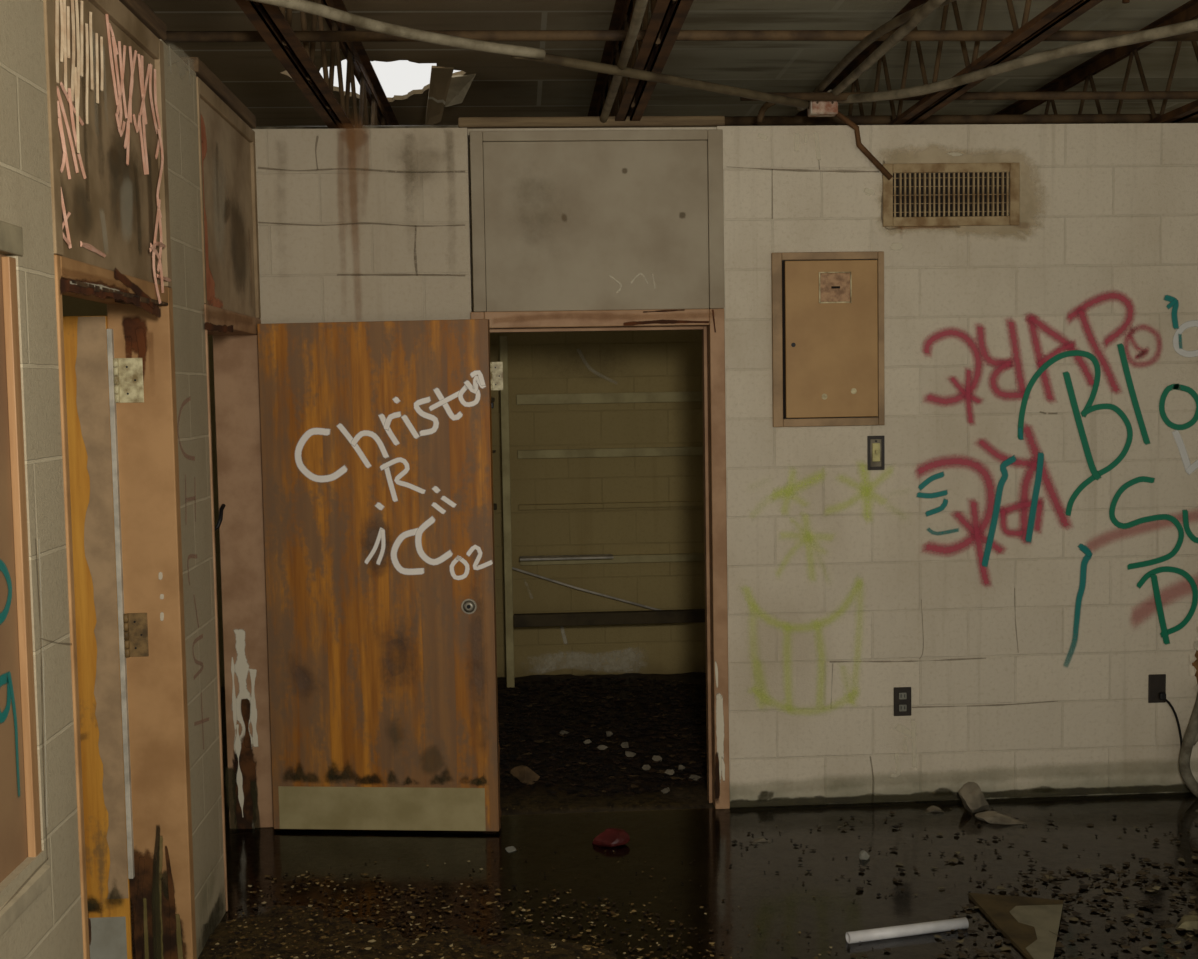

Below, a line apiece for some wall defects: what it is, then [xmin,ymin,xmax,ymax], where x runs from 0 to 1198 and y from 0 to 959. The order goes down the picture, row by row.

corrosion [60,268,161,377]